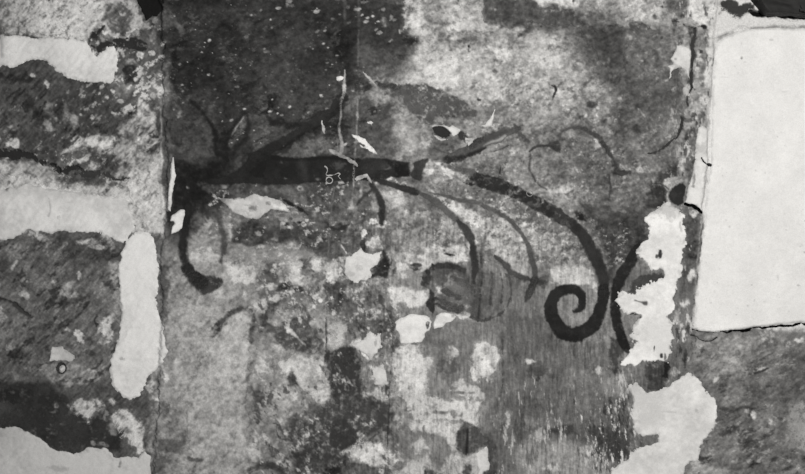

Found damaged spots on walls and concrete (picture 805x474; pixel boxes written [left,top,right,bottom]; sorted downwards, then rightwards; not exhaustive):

peeling [137,0,163,21]
peeling [0,25,147,84]
crack [0,148,130,181]
peeling [685,126,709,209]
peeling [0,97,185,474]
peeling [344,248,382,283]
peeling [615,201,687,366]
peeling [326,312,484,428]
peeling [611,372,717,474]